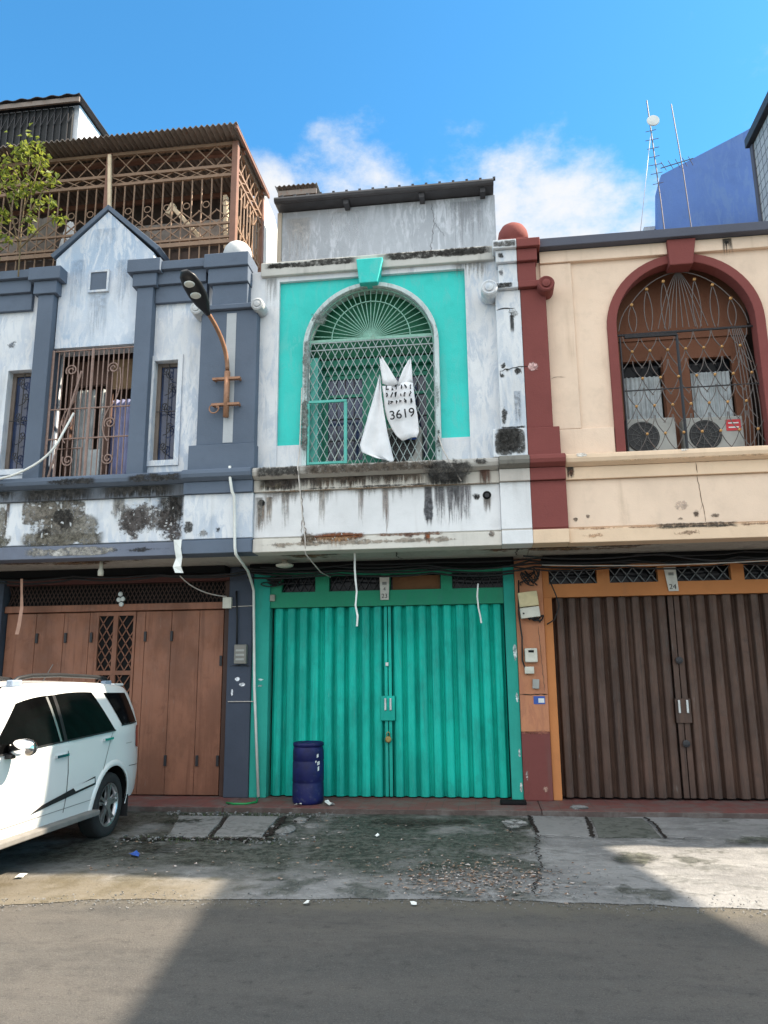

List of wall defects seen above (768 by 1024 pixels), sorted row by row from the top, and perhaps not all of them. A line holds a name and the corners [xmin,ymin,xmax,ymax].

water stain [268,257,353,269]
water stain [387,240,515,272]
water stain [257,391,525,522]
water stain [25,478,93,502]
water stain [105,473,220,541]
water stain [272,536,455,558]
corrosion [380,531,440,541]